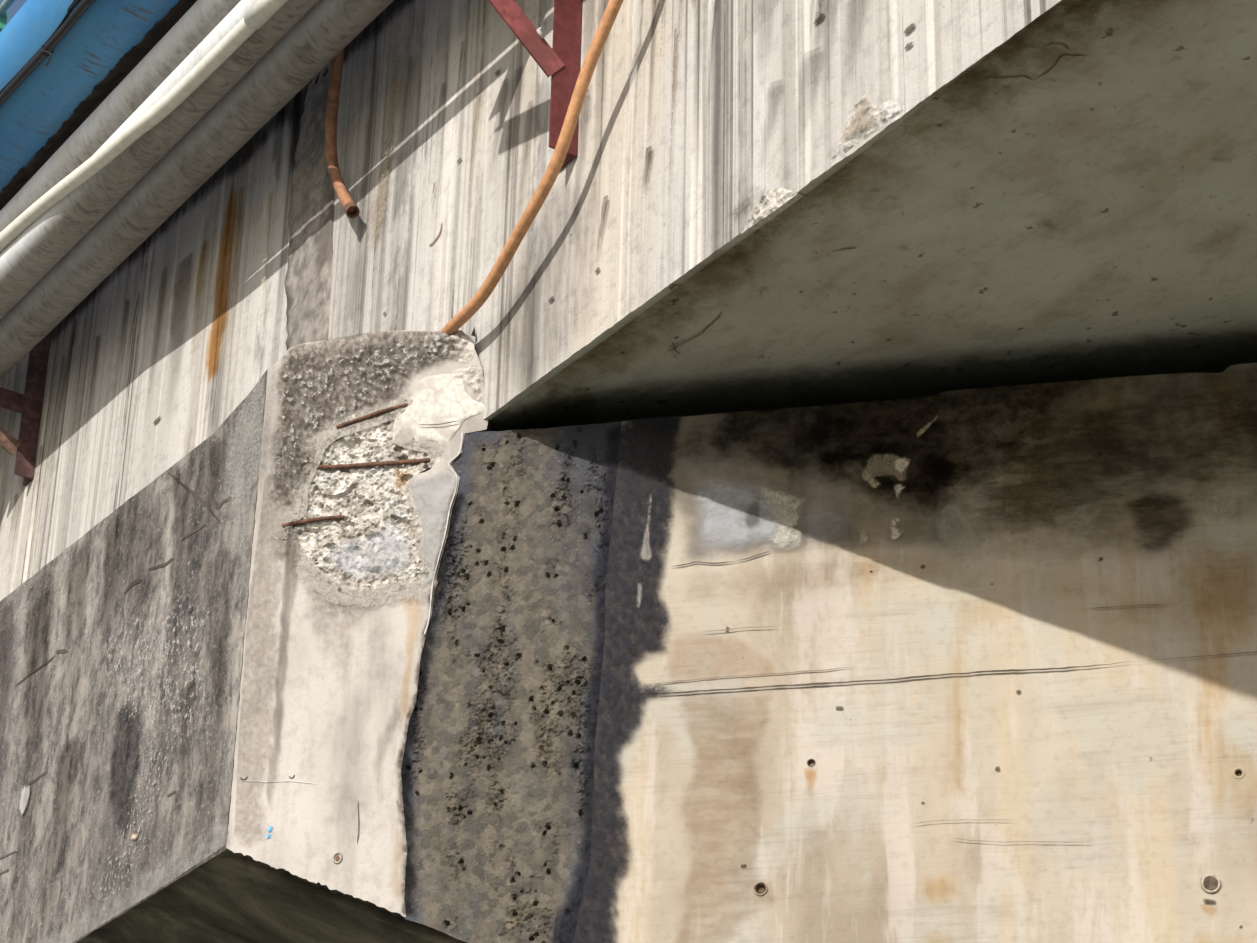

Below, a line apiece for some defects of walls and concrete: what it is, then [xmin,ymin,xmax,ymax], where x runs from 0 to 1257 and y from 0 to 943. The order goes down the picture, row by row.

spalling [416,332,485,405]
peeling [862,454,909,497]
spalling [275,397,463,636]
peeling [890,519,901,540]
damp [489,334,1257,943]
crack [634,651,1257,695]